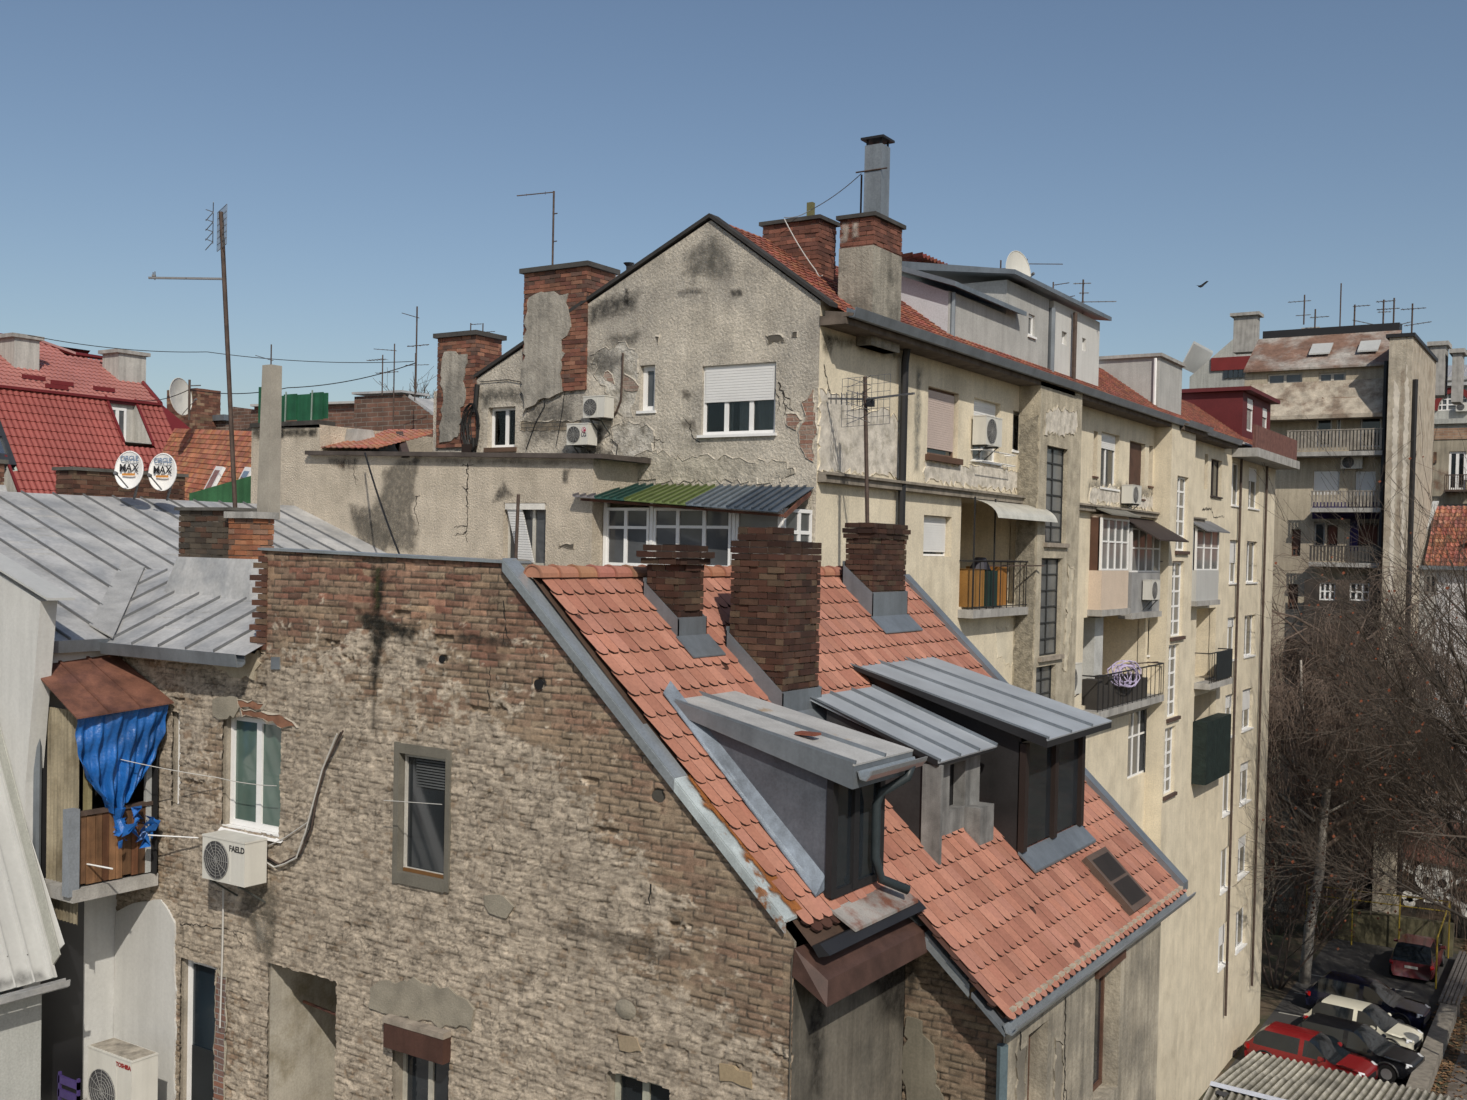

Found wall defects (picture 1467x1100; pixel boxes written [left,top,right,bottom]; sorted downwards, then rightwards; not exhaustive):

peeling [591,340,900,486]
peeling [766,331,798,345]
damp [351,459,417,688]
peeling [922,405,1078,692]